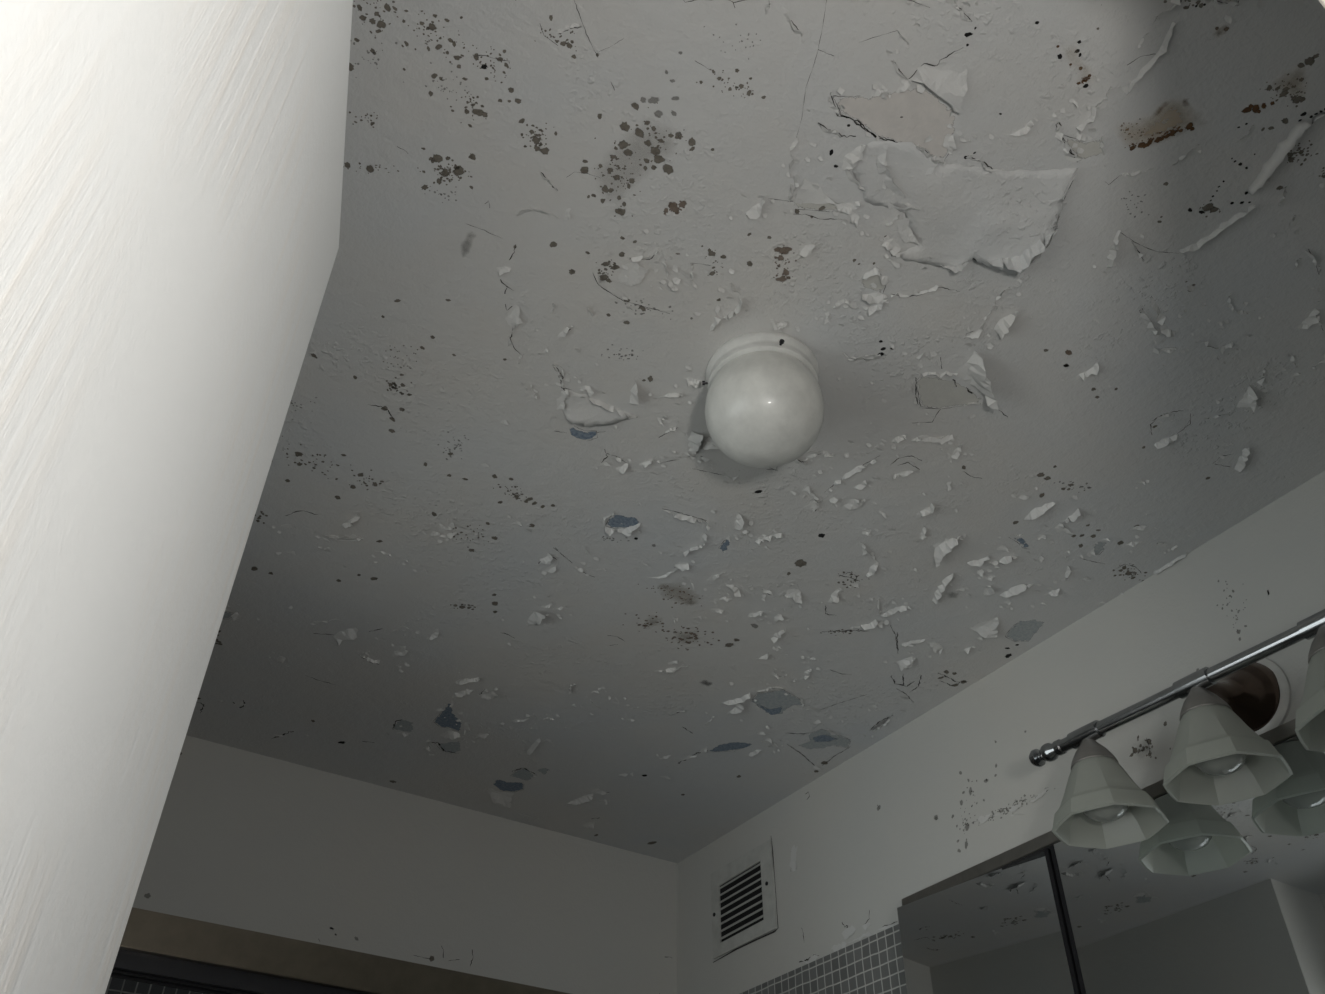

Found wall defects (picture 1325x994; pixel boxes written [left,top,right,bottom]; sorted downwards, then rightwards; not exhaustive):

leakage [420,148,476,203]
leakage [349,0,557,154]
leakage [586,236,637,276]
leakage [580,70,695,217]
crack [729,0,833,201]
leakage [768,236,797,283]
crack [865,0,977,46]
flaking render [729,48,1138,336]
corrosion [1121,101,1195,151]
flaking render [521,326,741,484]
peeling [600,279,1194,782]
flaking render [362,666,635,819]